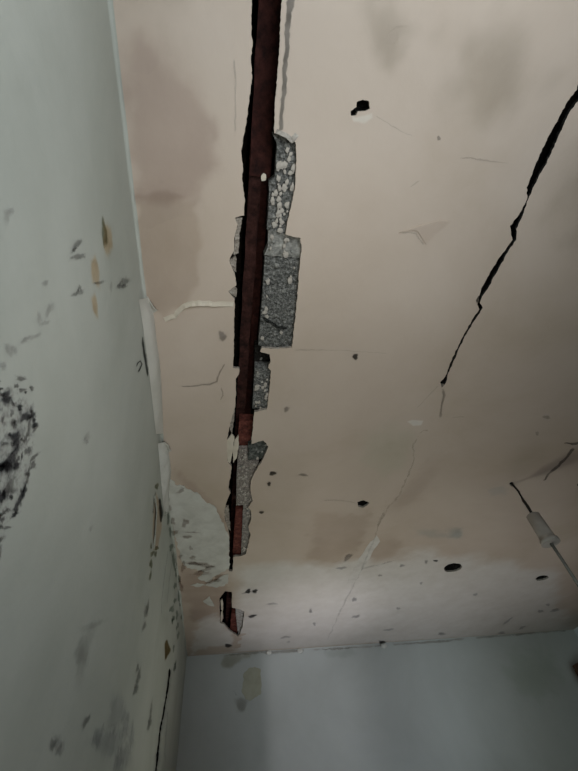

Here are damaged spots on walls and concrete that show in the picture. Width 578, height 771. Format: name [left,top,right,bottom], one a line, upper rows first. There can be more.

spalling [252,129,301,409]
crack [440,86,578,383]
mould [0,432,23,472]
mould [0,484,27,517]
mould [0,388,38,428]
peeling [153,479,230,606]
spalling [236,440,268,554]
spalling [235,608,244,634]